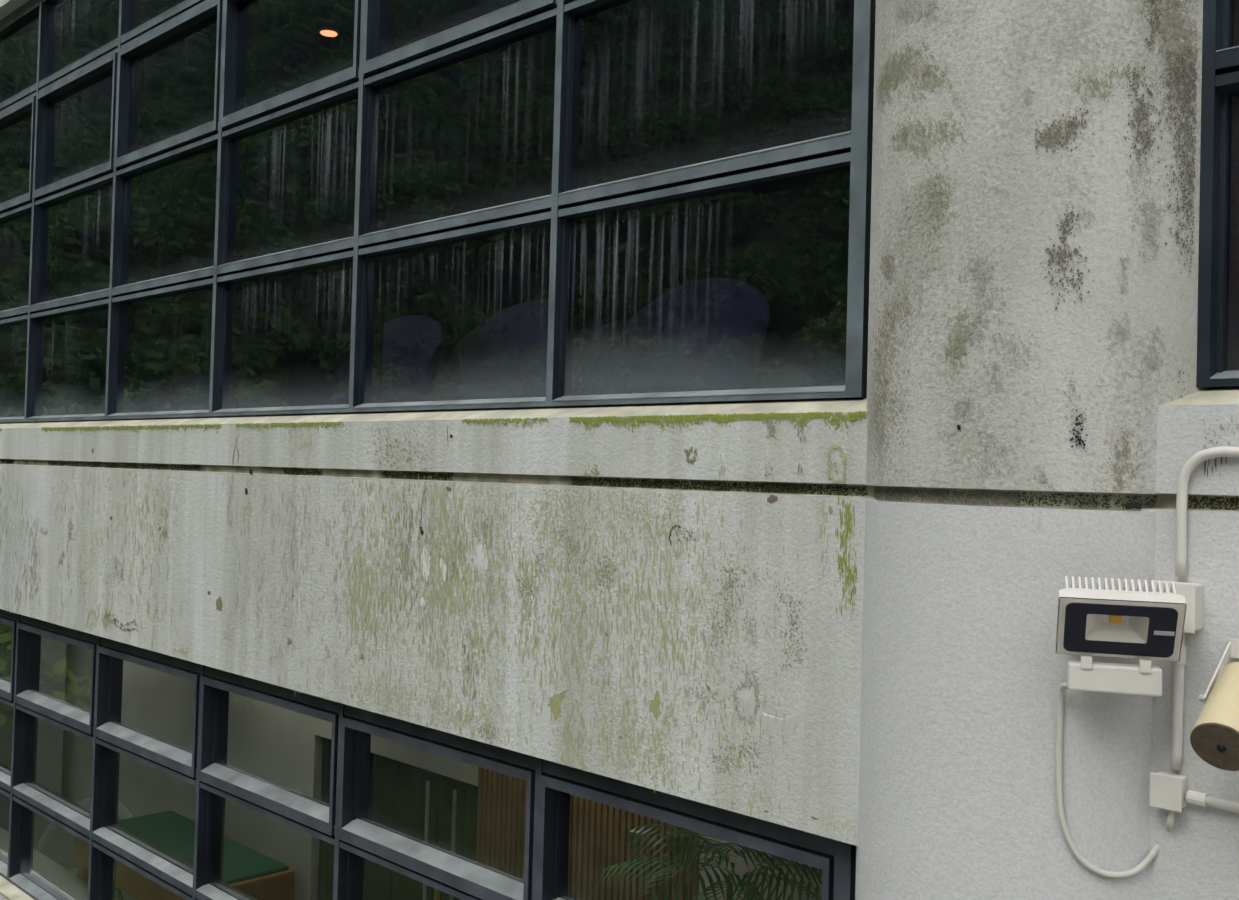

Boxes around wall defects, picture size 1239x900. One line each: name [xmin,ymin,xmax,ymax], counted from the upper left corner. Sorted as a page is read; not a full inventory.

mould [1034,0,1199,292]
mould [866,0,1055,491]
water stain [1064,369,1088,449]
mould [1105,316,1185,492]
mould [1203,415,1239,478]
water stain [222,474,365,700]
water stain [421,514,492,583]
water stain [517,518,616,606]
water stain [680,554,809,775]